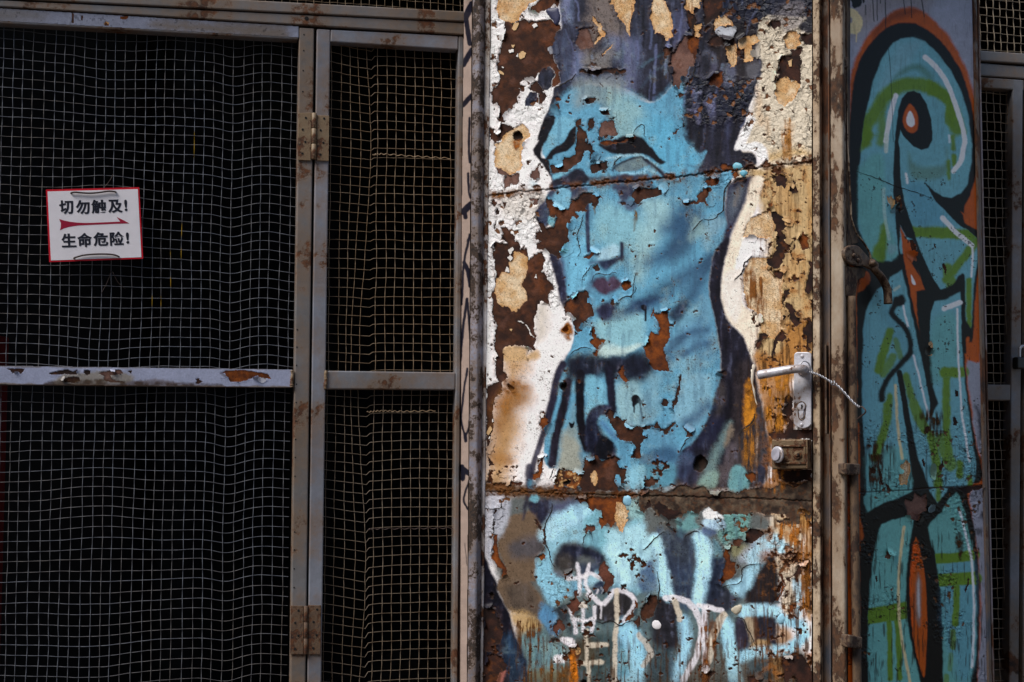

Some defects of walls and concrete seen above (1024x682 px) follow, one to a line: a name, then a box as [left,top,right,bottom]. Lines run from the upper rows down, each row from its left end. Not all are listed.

peeling [492,0,536,23]
peeling [684,0,760,68]
peeling [780,27,801,49]
peeling [770,77,800,107]
peeling [494,124,530,175]
peeling [495,251,528,312]
peeling [743,211,786,339]
rust [45,367,203,386]
rust [220,370,271,383]
rust [485,294,695,533]
peeling [615,502,630,532]